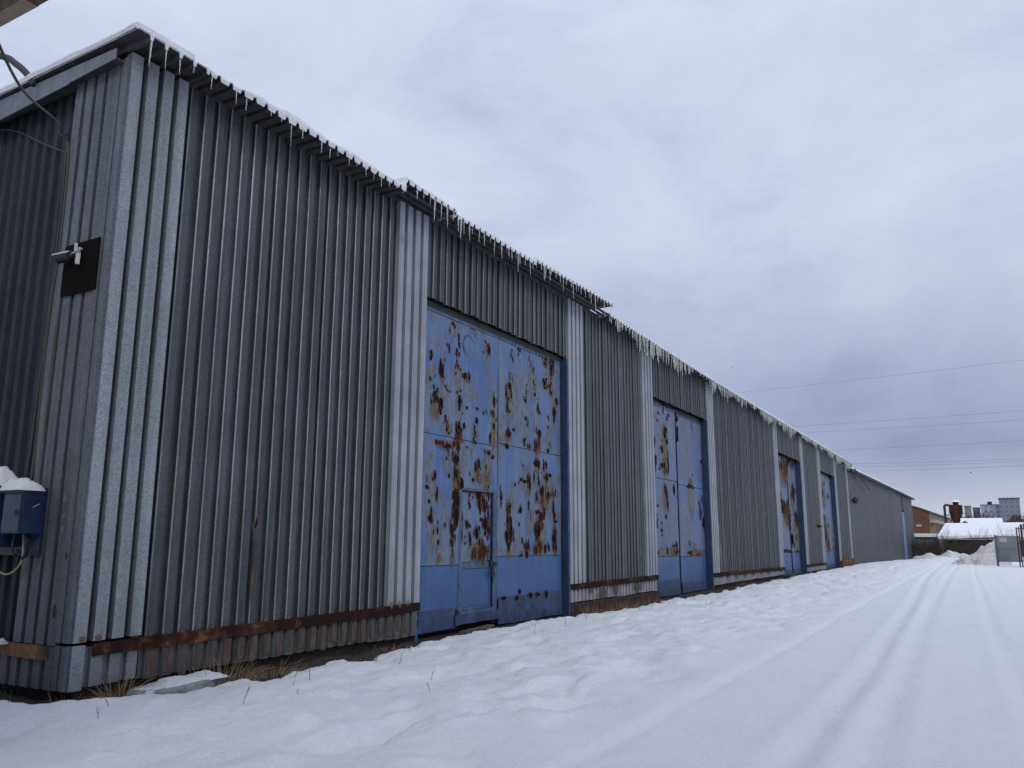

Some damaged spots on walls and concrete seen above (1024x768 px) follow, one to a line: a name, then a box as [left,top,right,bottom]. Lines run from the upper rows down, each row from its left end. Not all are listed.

rust [145,601,409,678]